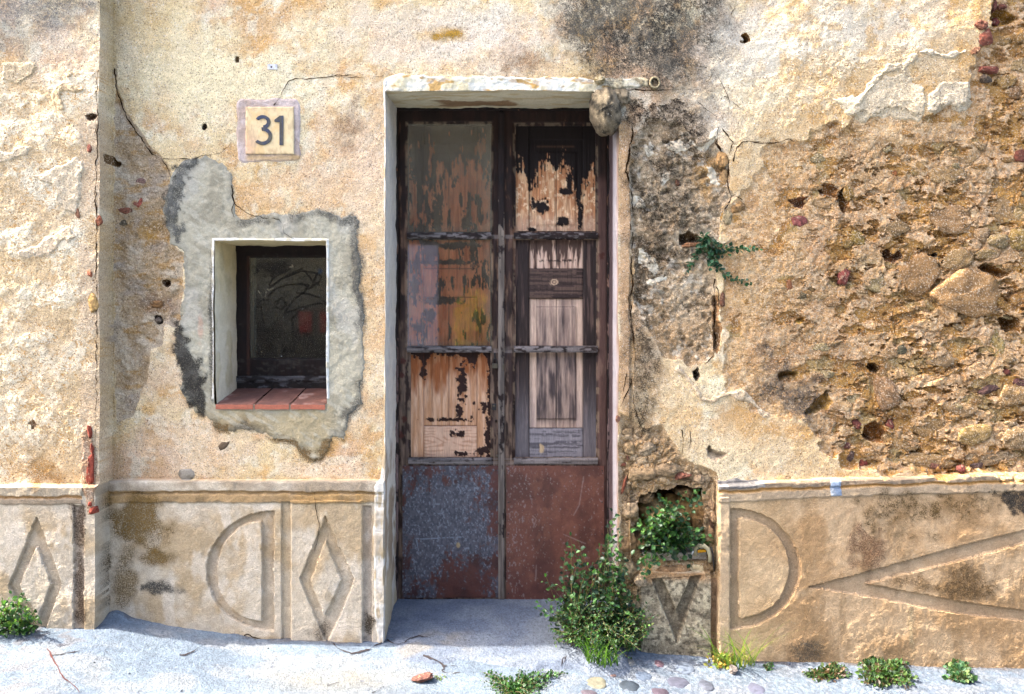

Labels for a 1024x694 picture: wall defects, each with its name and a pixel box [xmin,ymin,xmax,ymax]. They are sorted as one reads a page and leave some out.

crack [93,68,235,437]
crack [274,74,383,105]
damp [553,0,727,296]
crack [698,72,798,223]
spalling [629,0,1024,483]
damp [101,491,180,607]